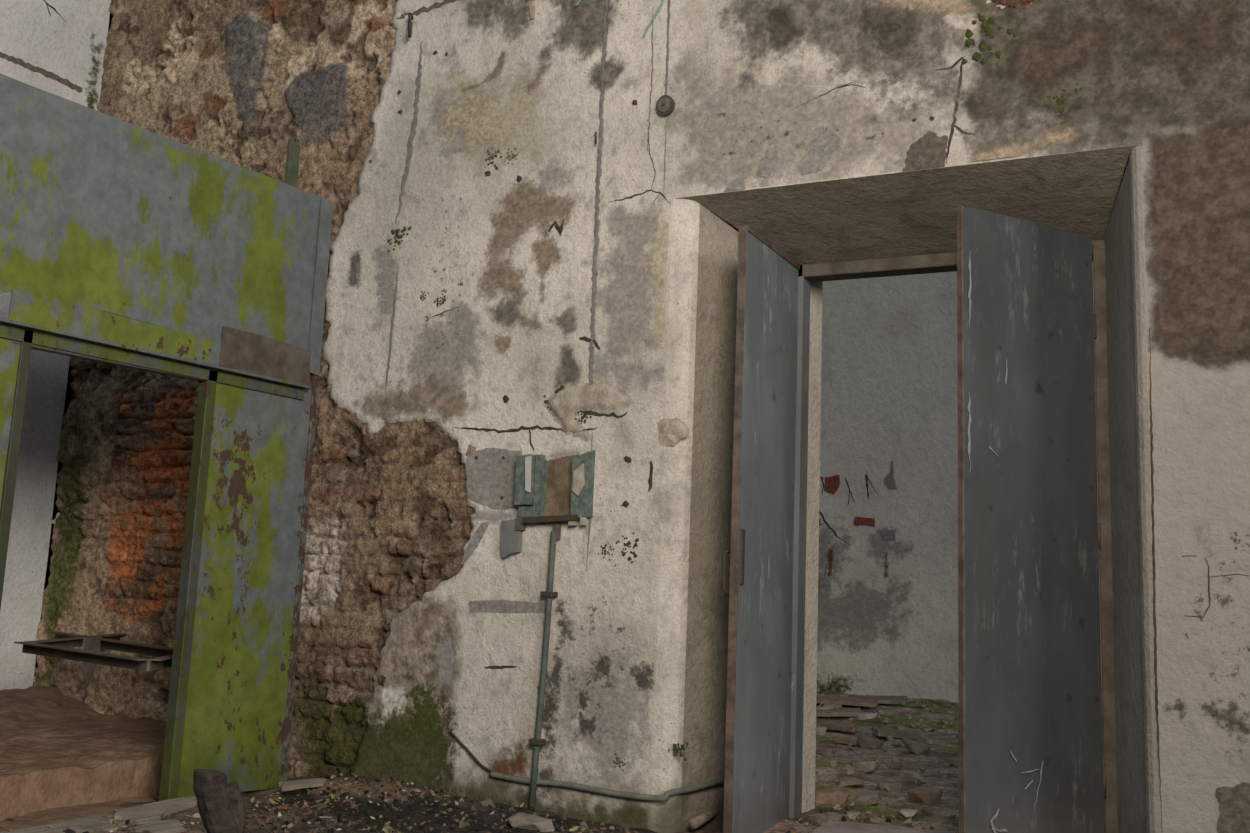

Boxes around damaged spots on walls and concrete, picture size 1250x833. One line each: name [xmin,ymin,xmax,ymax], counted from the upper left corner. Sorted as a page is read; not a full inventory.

spalling [97,0,406,279]
leakage [421,0,624,159]
leakage [479,160,574,351]
peeling [878,0,1034,16]
crack [936,57,976,163]
leakage [674,0,1250,367]
leakage [353,303,480,422]
crack [455,410,628,451]
leakage [556,309,580,387]
spalling [33,357,200,721]
spalling [288,302,483,794]